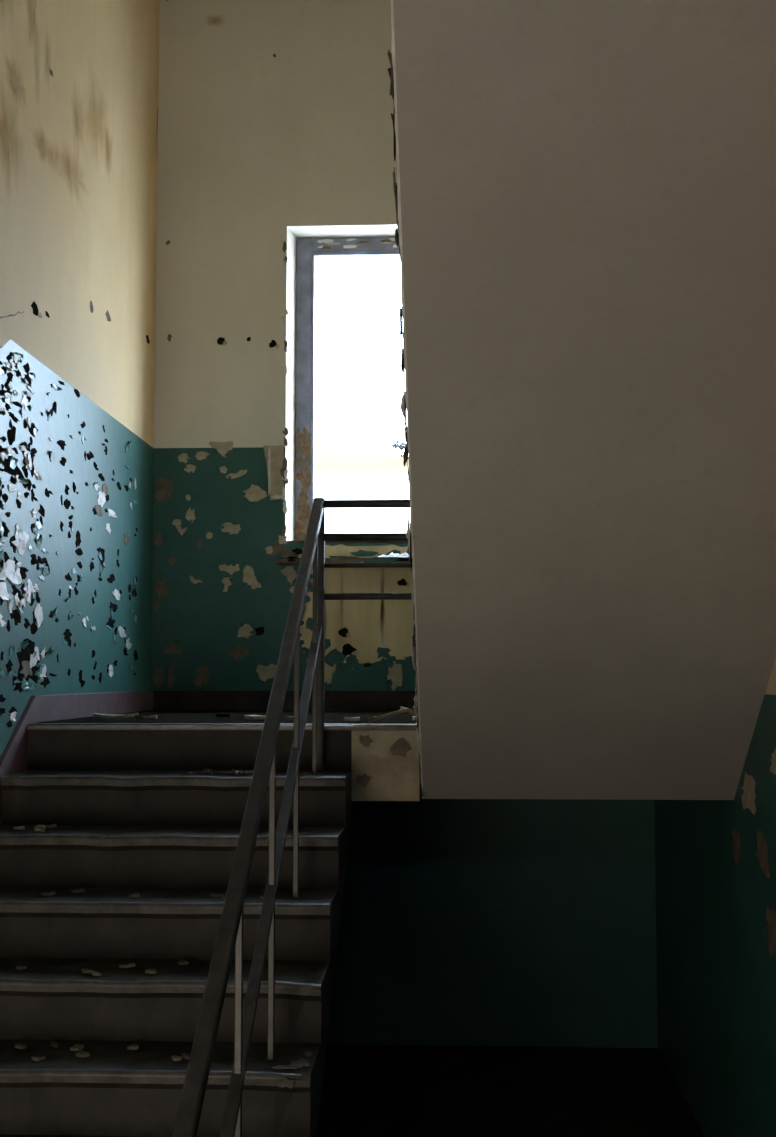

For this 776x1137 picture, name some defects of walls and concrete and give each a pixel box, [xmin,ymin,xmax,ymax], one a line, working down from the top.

flaking render [269,309,288,374]
peeling [0,352,141,727]
peeling [153,390,419,787]